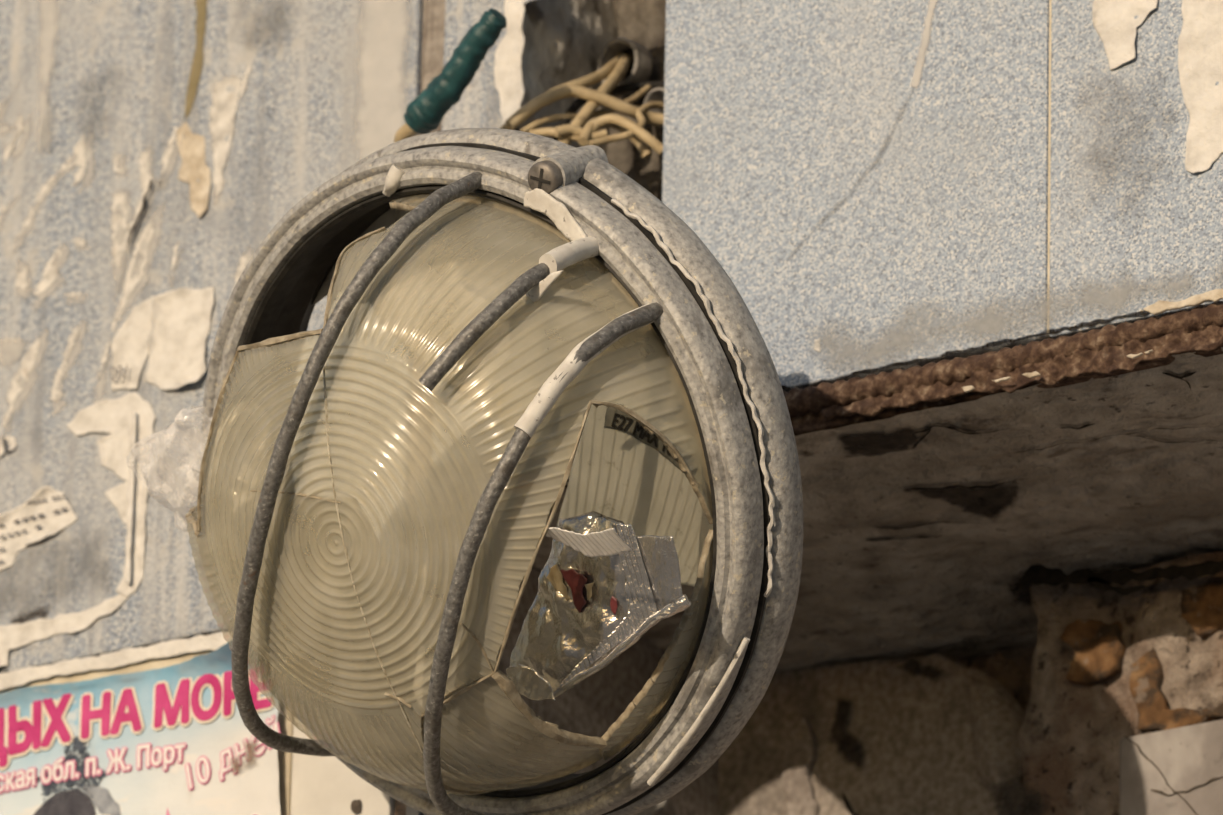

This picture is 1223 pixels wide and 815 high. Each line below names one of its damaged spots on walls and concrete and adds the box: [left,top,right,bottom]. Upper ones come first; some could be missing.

peeling [1092,0,1158,70]
peeling [1178,0,1223,173]
rust [783,289,1223,420]
rust [430,450,505,492]
spalling [904,482,1020,519]
crack [1125,736,1223,815]